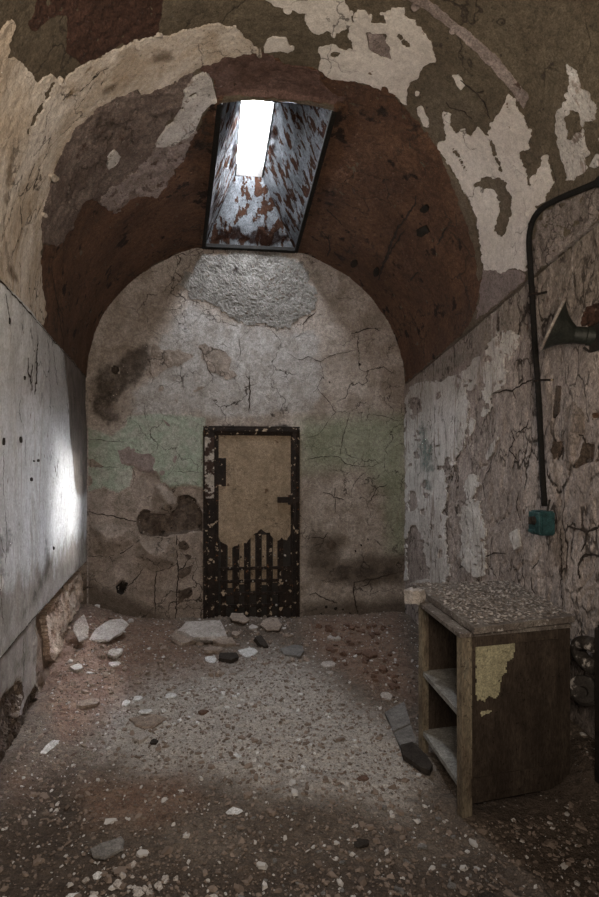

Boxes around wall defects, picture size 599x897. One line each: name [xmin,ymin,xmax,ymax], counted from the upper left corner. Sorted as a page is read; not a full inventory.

corrosion [211,193,288,246]
flaking render [0,0,599,625]
crack [0,280,79,561]
water stain [93,346,149,421]
crack [238,341,251,410]
crack [484,419,529,480]
crack [492,379,533,399]
flaking render [39,571,83,662]
crack [129,535,188,618]
crack [531,525,599,606]
flaking render [0,681,38,763]
peeling [40,740,60,754]